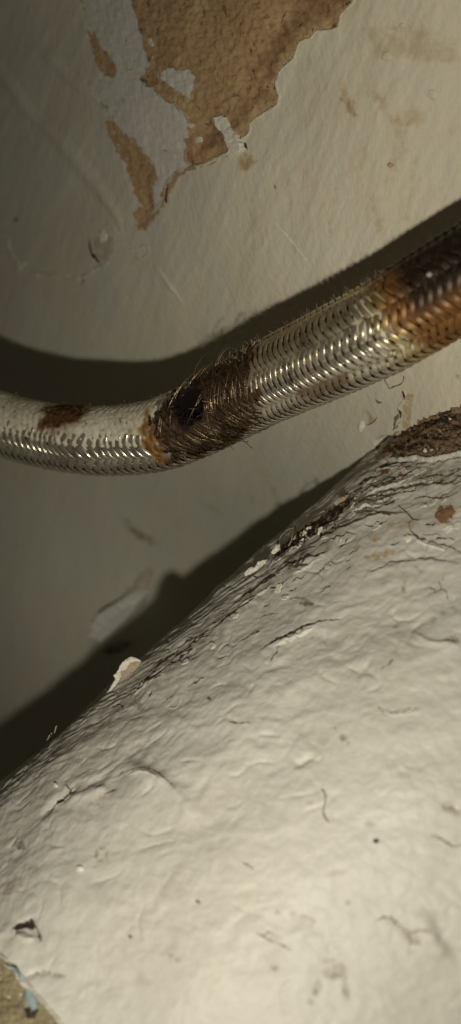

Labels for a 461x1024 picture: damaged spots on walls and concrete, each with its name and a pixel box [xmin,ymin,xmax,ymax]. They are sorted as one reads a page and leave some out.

peeling [80,0,356,231]
peeling [435,505,456,524]
crack [112,411,461,710]
flaking render [107,657,141,693]
spalling [12,918,42,944]